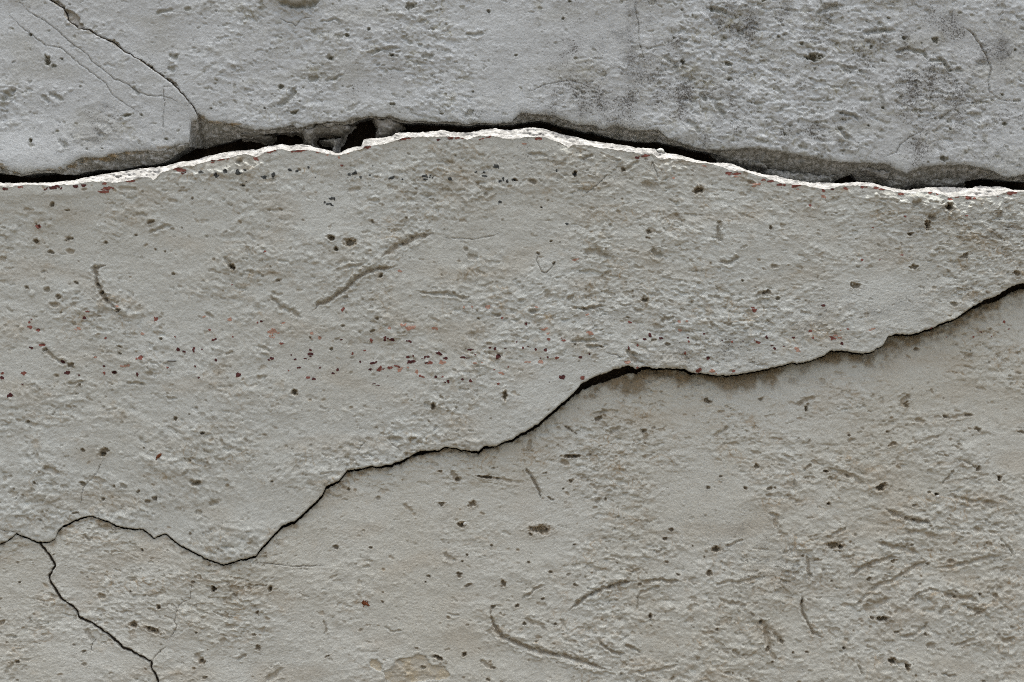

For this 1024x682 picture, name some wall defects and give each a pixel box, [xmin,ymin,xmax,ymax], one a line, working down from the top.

crack [50,0,198,115]
crack [0,118,1024,190]
crack [0,283,1024,682]